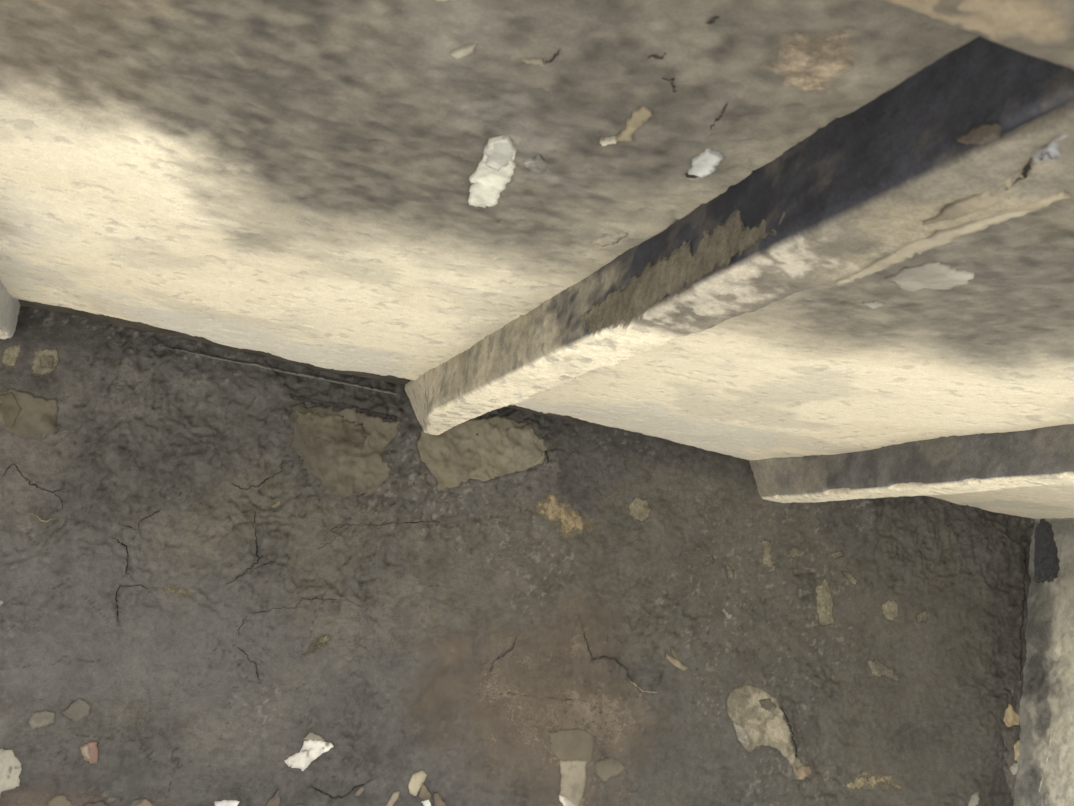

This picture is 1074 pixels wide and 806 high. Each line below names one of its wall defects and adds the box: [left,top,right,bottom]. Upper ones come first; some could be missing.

peeling [468,135,549,208]
crack [1,464,65,512]
crack [111,510,160,622]
crack [230,468,283,583]
peeling [289,402,401,498]
peeling [417,415,548,491]
damp [1032,519,1060,583]
peeling [0,748,22,794]
peeling [284,732,334,771]
spalling [727,684,811,780]